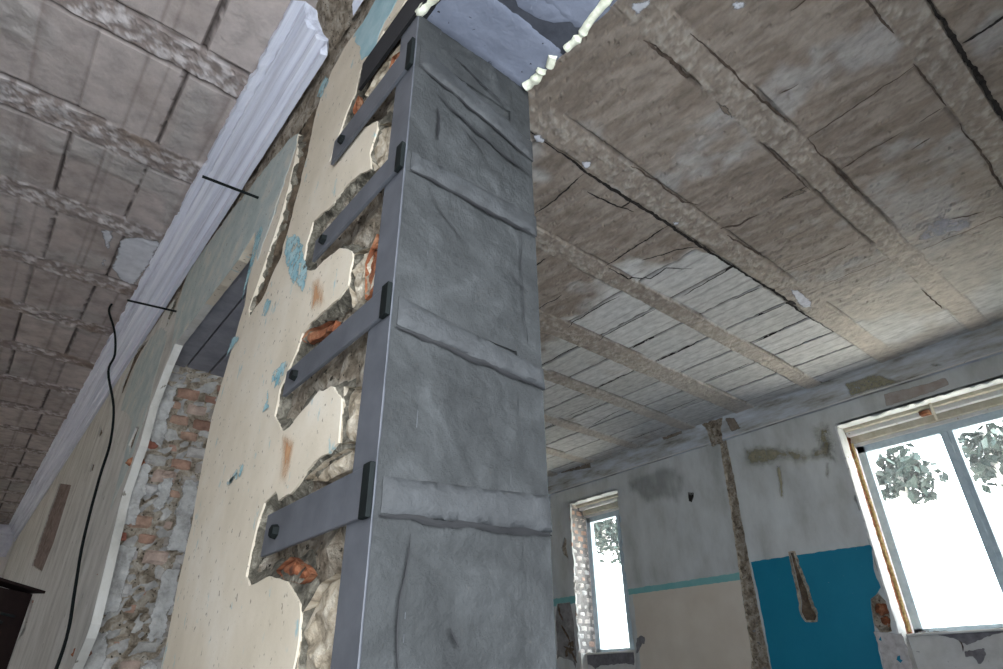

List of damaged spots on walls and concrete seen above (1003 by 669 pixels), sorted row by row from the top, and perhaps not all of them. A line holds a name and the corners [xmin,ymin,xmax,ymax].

spalling [342,31,406,131]
crack [690,33,1003,194]
crack [927,0,1003,121]
crack [927,211,1003,248]
spalling [121,272,189,394]
spalling [197,0,396,669]
spalling [34,484,71,571]
flaking render [83,365,221,669]
spalling [555,602,645,669]
flaking render [788,551,818,622]
peeling [871,594,913,669]
spalling [919,627,1003,664]